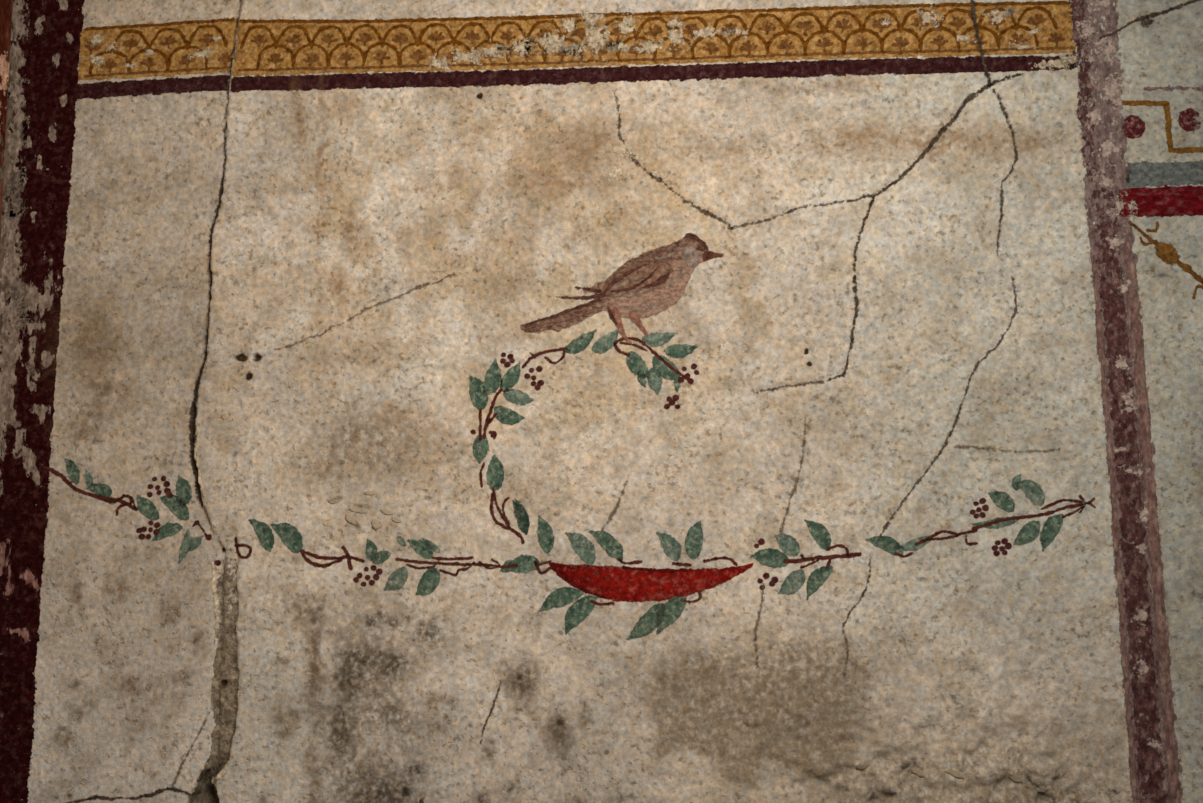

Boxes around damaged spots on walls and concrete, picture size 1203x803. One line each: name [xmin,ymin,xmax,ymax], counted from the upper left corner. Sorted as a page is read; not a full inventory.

peeling [52,32,73,68]
peeling [418,3,749,73]
crack [1099,0,1199,39]
peeling [0,0,68,495]
crack [189,0,242,505]
crack [275,273,455,350]
crack [599,0,1060,676]
peeling [0,539,40,596]
crack [66,549,240,803]
damp [332,612,406,766]
damp [657,655,854,783]
damp [355,784,409,803]